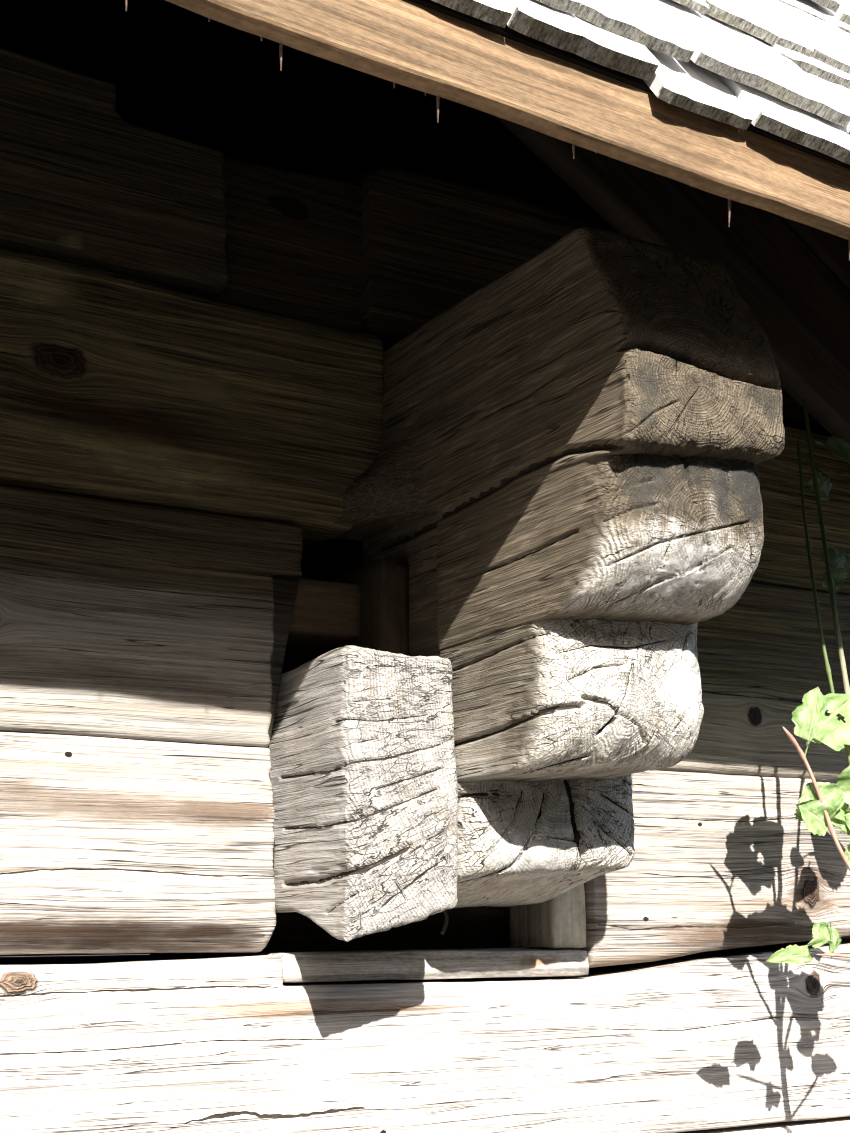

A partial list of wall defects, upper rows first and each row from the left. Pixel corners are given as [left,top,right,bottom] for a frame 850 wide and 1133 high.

crack [382,348,749,551]
crack [608,521,752,604]
crack [283,627,803,883]
crack [184,1107,364,1124]